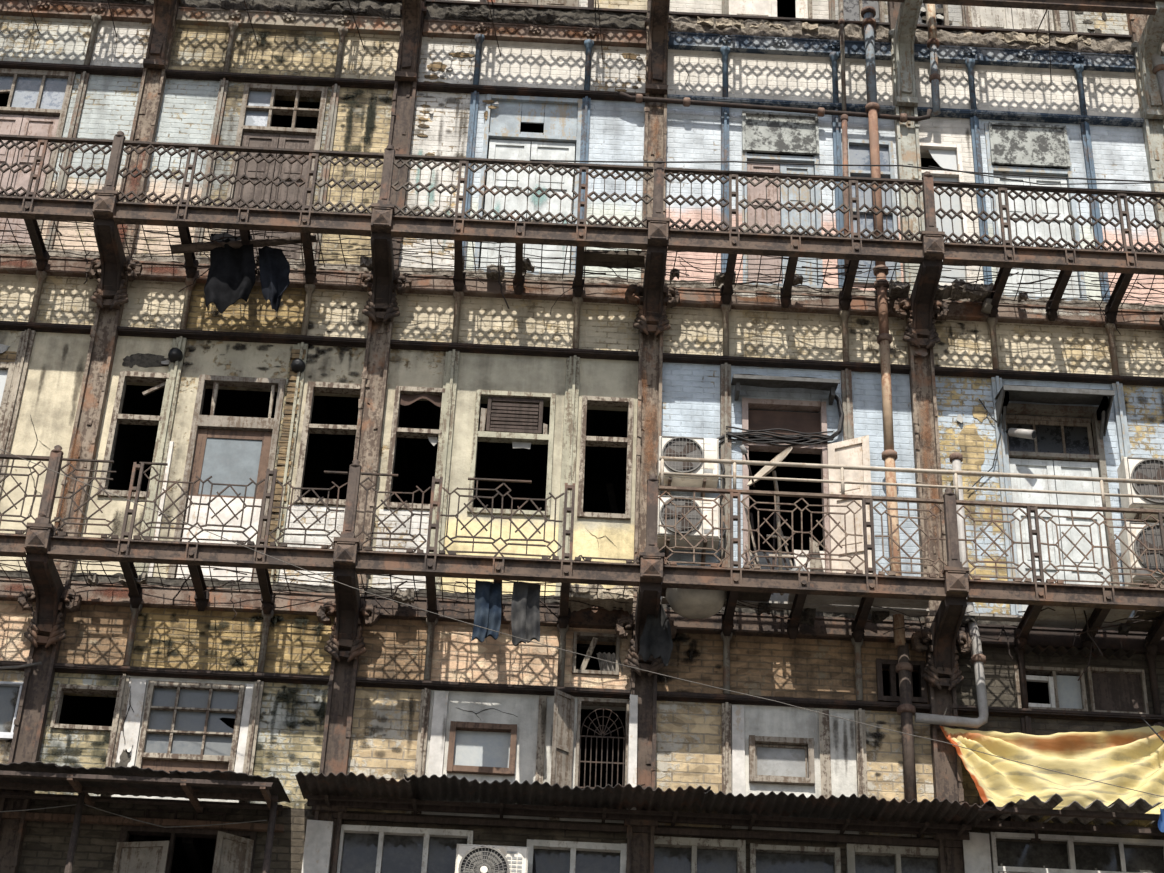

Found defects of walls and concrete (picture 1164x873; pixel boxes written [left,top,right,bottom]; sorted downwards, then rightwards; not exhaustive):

spalling [221,0,391,20]
peeling [0,344,17,362]
mould [256,685,326,757]